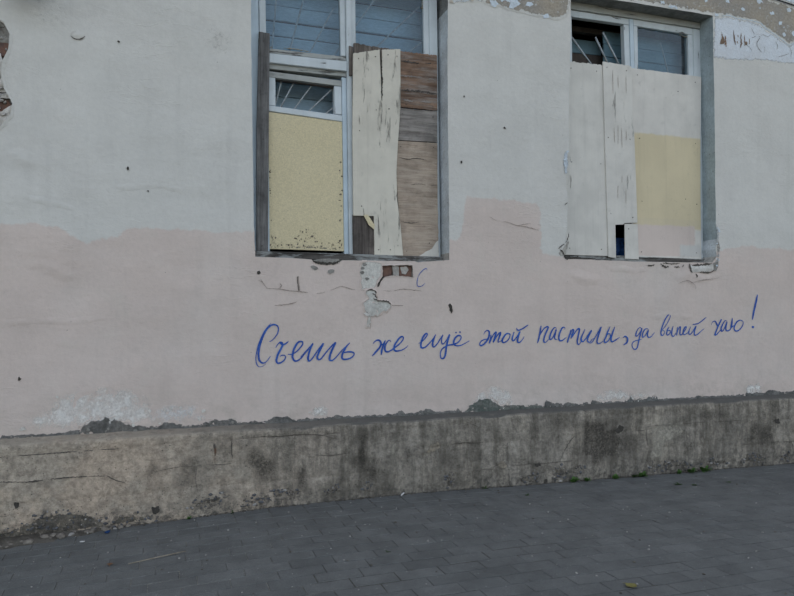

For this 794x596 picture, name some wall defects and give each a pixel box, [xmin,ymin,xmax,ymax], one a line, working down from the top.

peeling [450,0,571,20]
peeling [641,0,794,63]
spalling [0,18,14,130]
spalling [359,260,414,329]
spalling [79,416,160,434]
spalling [193,418,265,427]
crack [0,448,118,458]
crack [0,475,125,483]